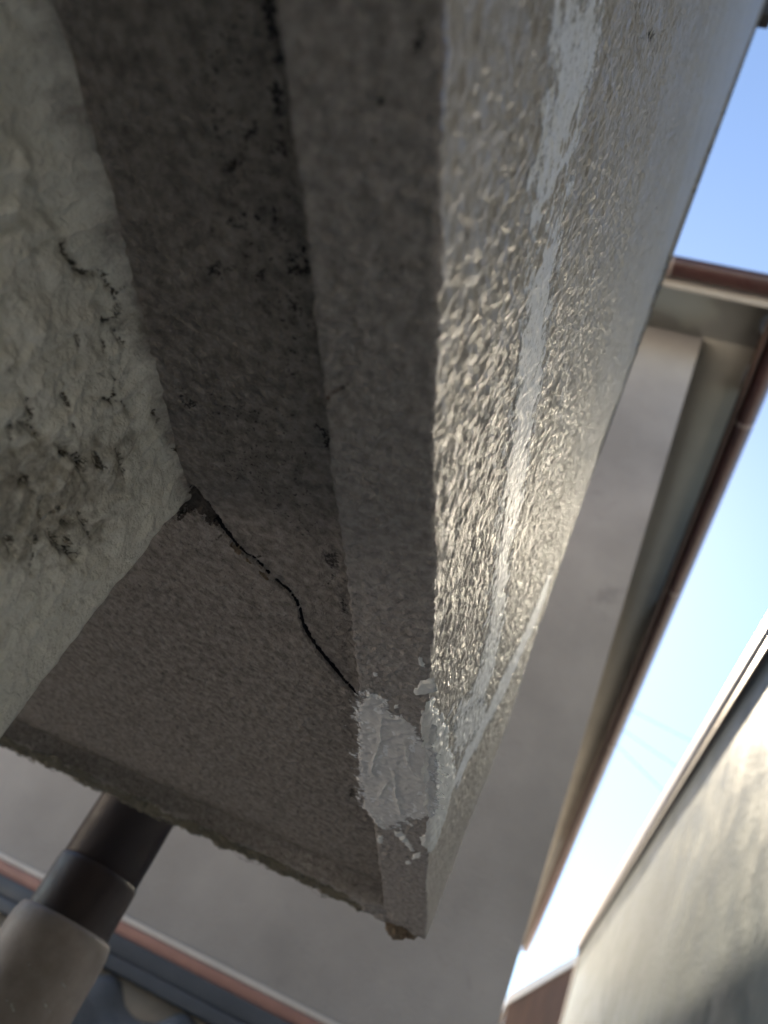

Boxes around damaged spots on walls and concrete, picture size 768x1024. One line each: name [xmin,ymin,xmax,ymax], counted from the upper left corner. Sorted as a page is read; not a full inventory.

crack [213,516,359,696]
peeling [349,657,456,865]